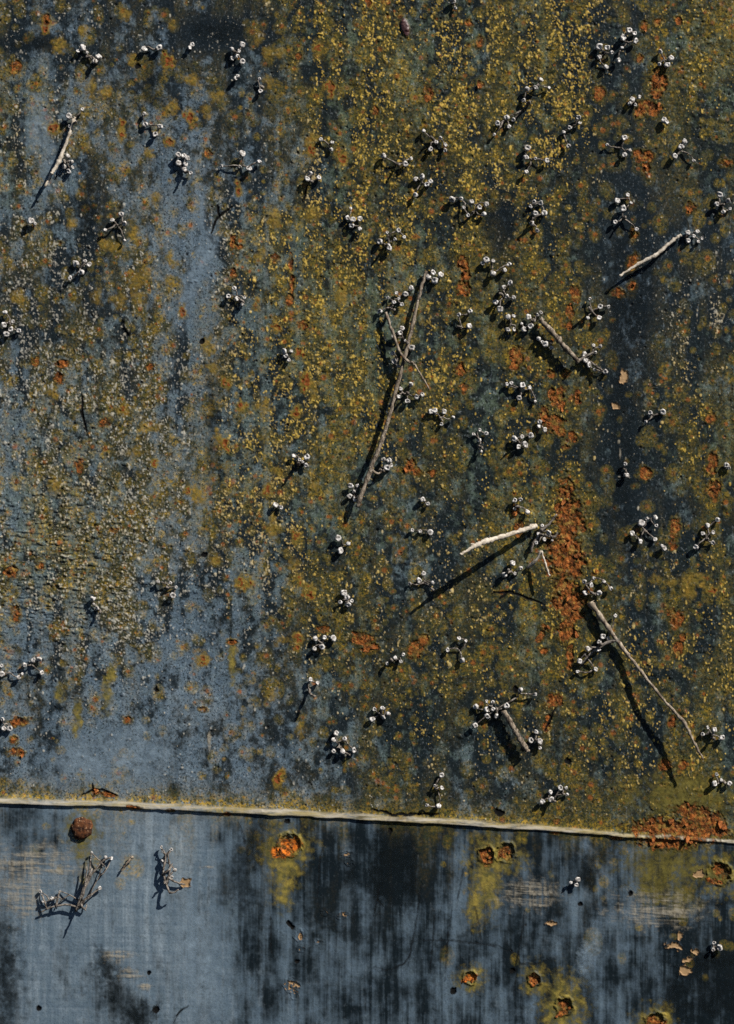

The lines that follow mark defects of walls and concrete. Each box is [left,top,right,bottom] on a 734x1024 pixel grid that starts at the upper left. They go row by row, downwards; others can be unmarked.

rust [634,69,668,117]
rust [535,477,587,671]
rust [351,631,380,654]
rust [408,634,430,659]
rust [266,822,309,905]
rust [468,835,521,922]
rust [611,759,734,911]
rust [526,968,585,1024]